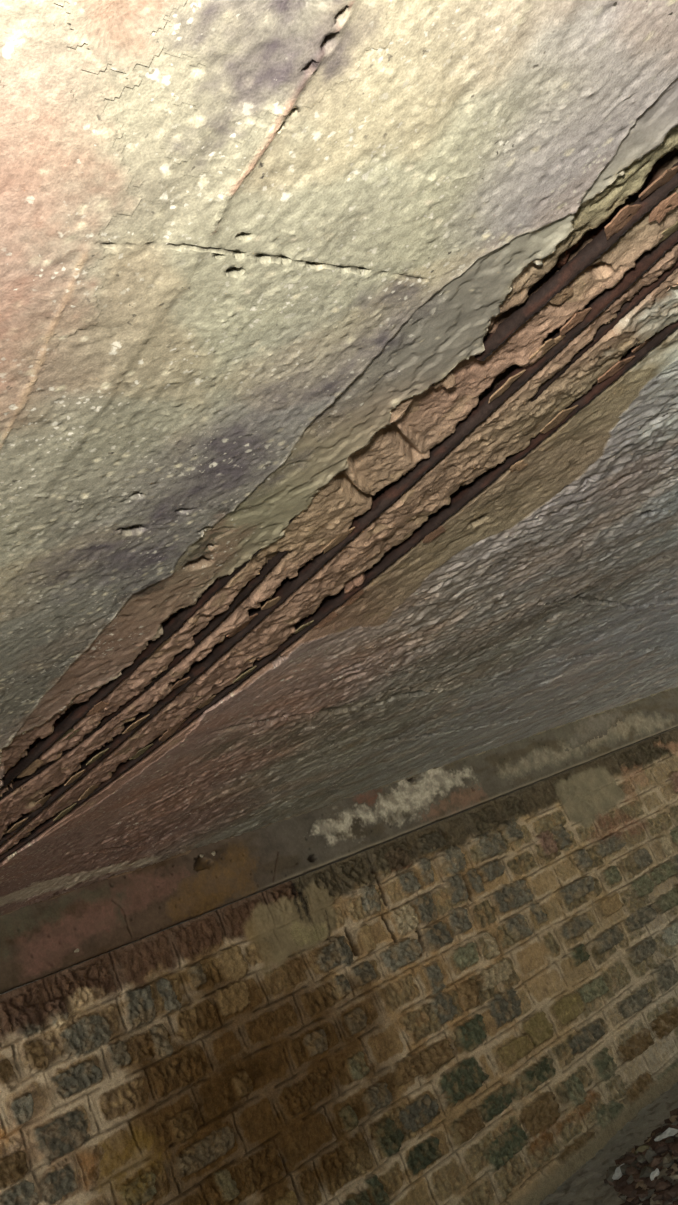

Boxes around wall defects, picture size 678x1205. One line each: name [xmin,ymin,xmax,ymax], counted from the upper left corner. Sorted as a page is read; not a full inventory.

crack [102,108,429,280]
spalling [0,78,678,867]
water stain [303,704,677,854]
water stain [0,849,173,965]
water stain [289,880,338,951]
water stain [43,985,105,1041]
water stain [0,1060,38,1107]
water stain [167,1036,280,1140]
water stain [82,1118,172,1205]